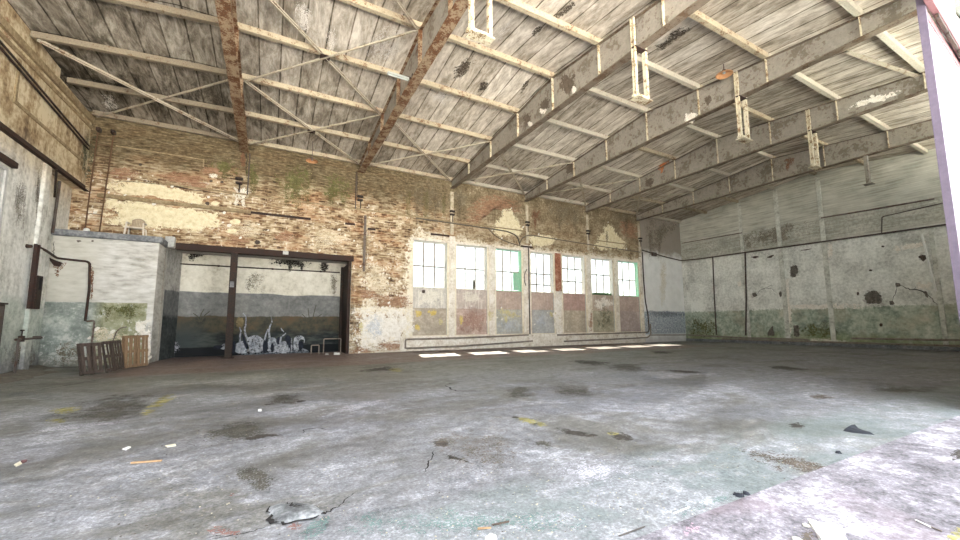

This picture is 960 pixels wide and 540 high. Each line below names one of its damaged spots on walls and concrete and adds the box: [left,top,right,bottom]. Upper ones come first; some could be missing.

peeling [849,90,901,108]
peeling [93,163,355,252]
spalling [466,194,557,247]
peeling [593,224,627,250]
peeling [779,264,884,337]
crack [889,283,935,305]
damp [791,321,848,342]